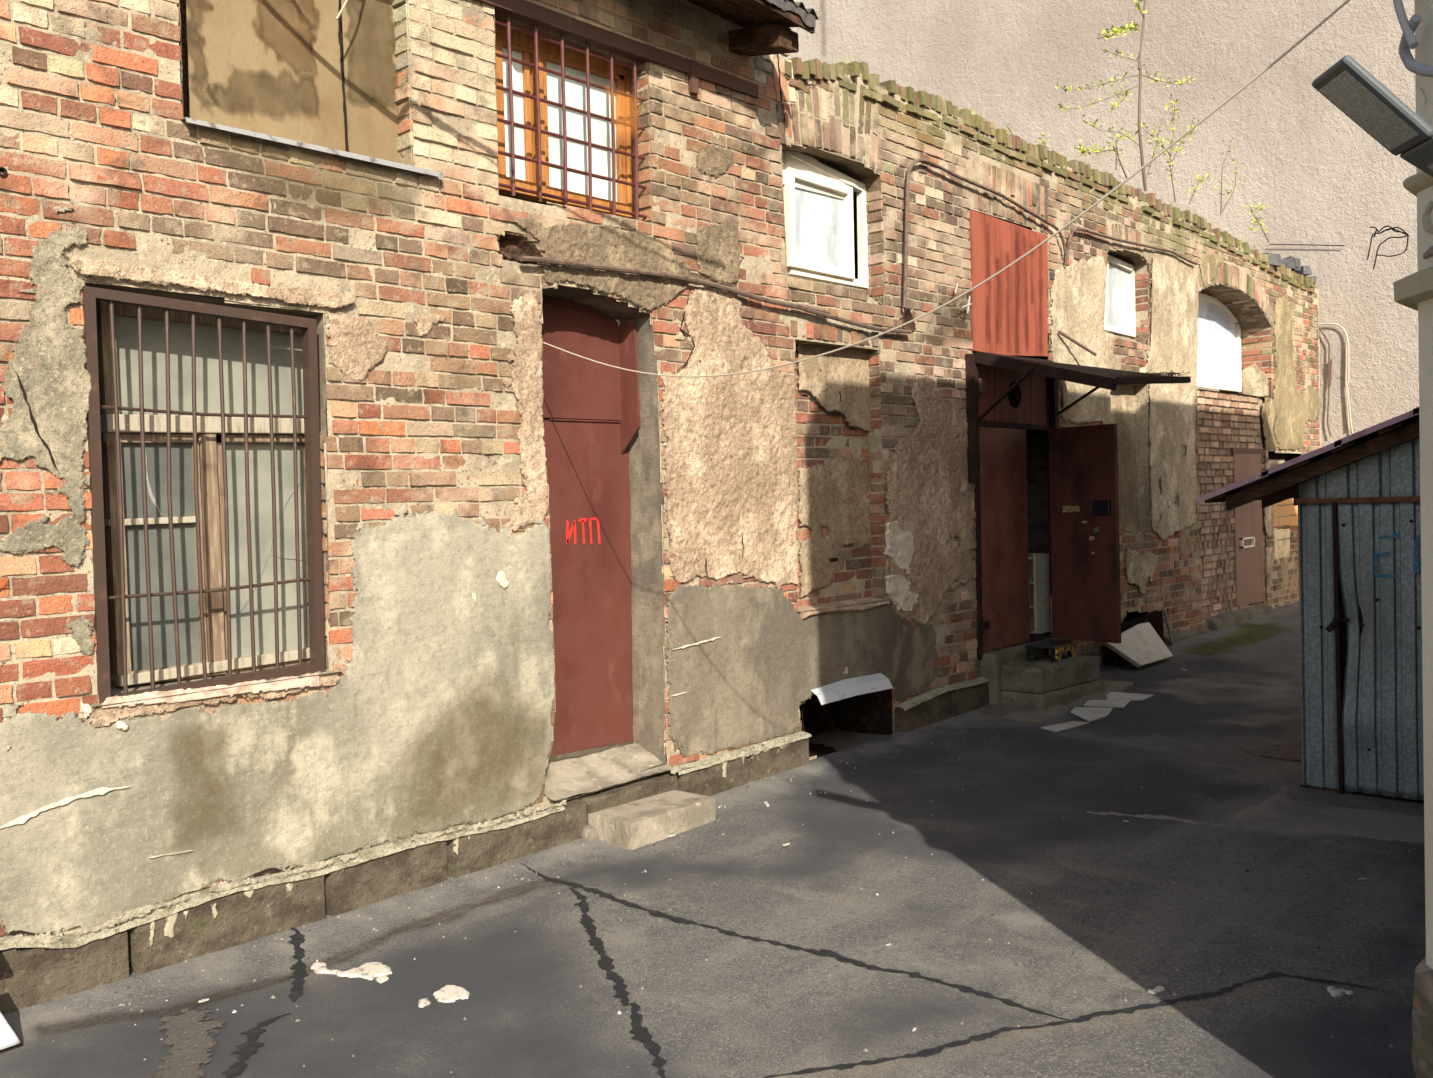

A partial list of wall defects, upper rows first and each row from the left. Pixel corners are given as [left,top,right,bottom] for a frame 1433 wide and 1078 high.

crack [13,368,58,471]
flaking render [0,206,91,572]
flaking render [497,216,973,624]
crack [0,929,59,937]
spalling [0,844,372,950]
crack [243,868,285,880]
crack [222,927,309,1078]
spalling [394,800,566,842]
crack [523,864,1390,1078]